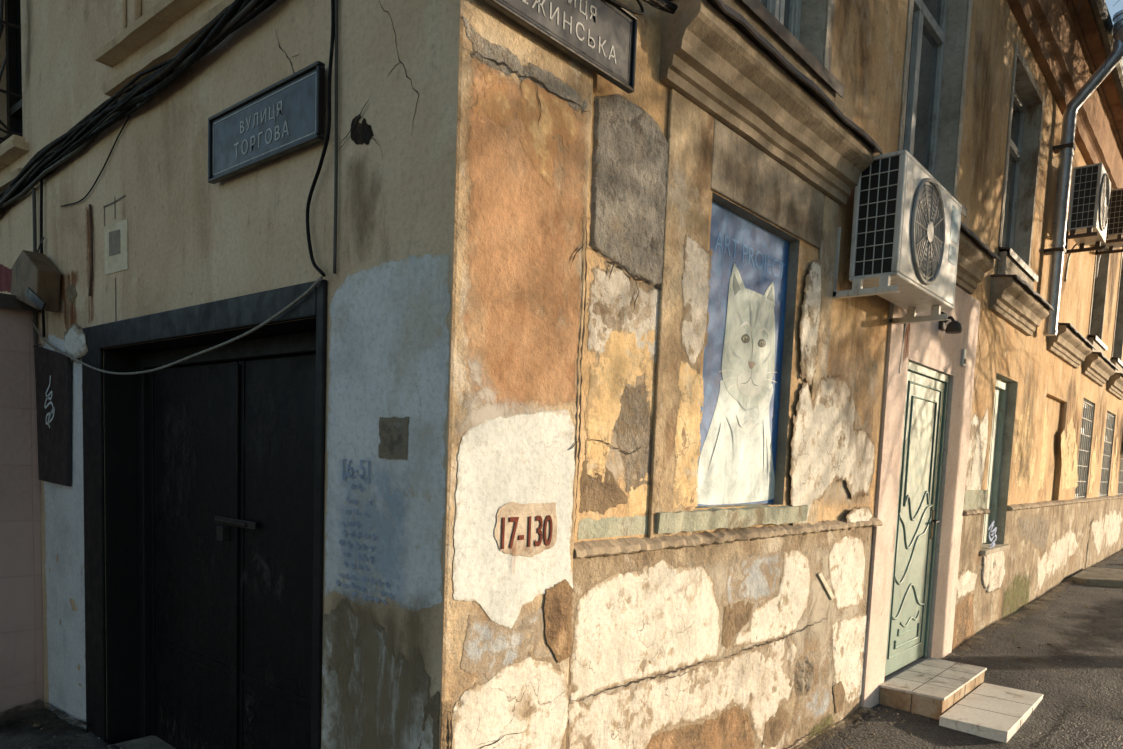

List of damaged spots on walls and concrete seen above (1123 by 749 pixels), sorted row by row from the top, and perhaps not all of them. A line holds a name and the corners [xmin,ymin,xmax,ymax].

crack [379,1,419,136]
hole [350,115,374,145]
peeling [464,60,660,517]
peeling [790,259,877,530]
peeling [378,417,409,460]
peeling [965,407,989,490]
spalling [702,563,765,664]
peeling [777,550,862,714]
spalling [418,691,453,749]
peeling [573,667,680,705]
spalling [646,706,790,749]